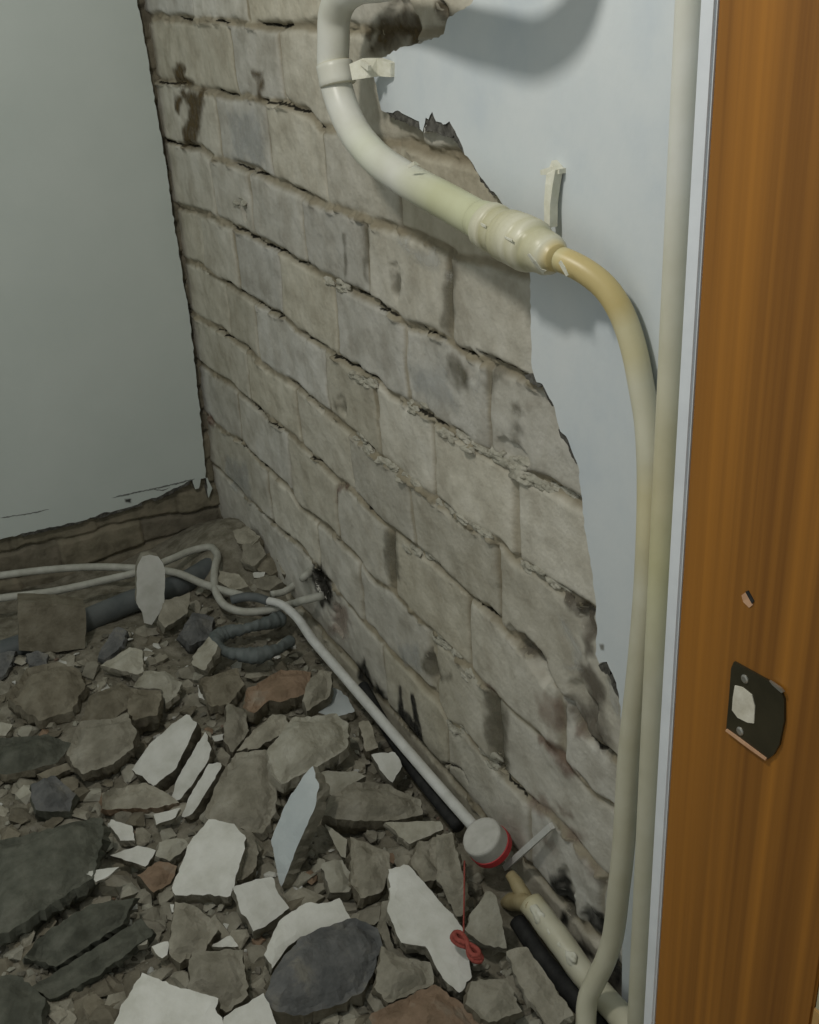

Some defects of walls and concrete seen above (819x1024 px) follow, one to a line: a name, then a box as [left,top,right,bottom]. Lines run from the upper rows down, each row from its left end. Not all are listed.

spalling [0,0,621,962]
leakage [367,13,422,52]